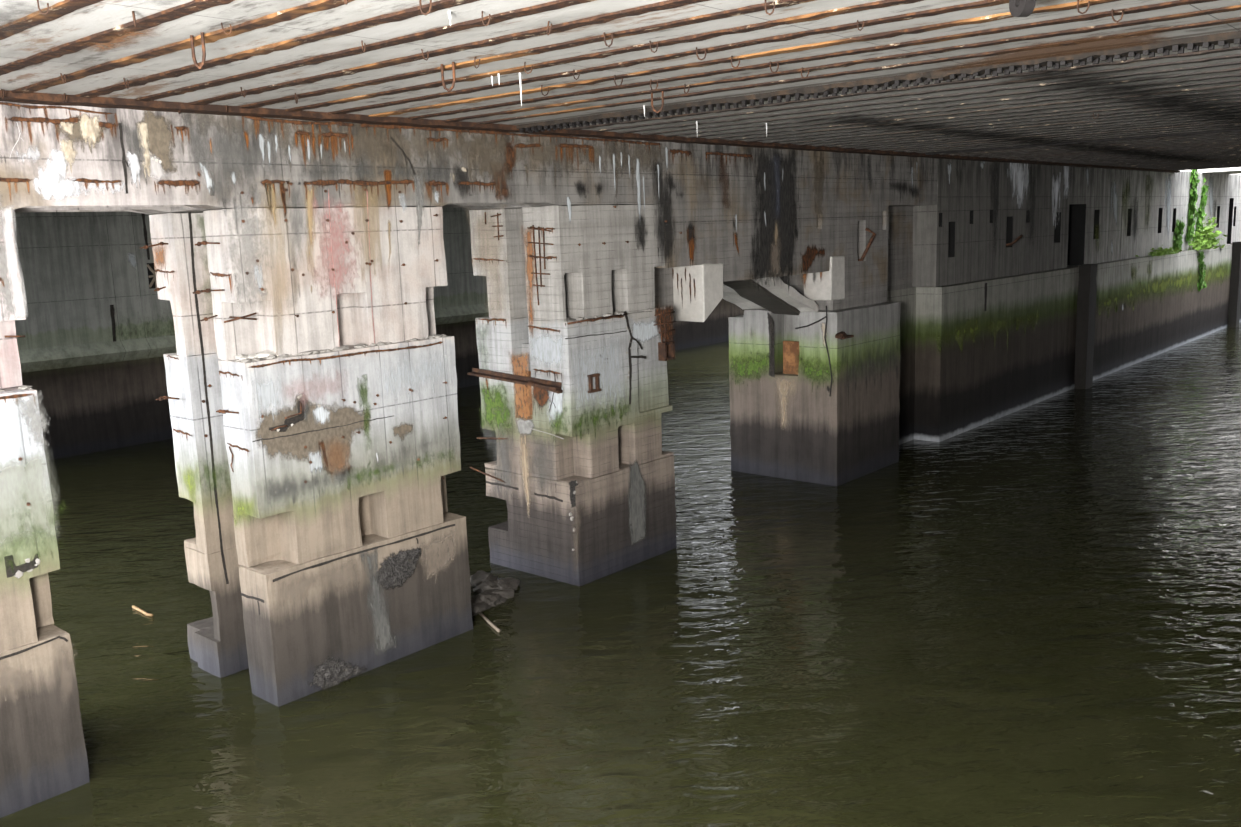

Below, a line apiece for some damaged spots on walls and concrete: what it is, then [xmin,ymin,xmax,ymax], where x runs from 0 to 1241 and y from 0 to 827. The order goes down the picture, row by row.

rust [0,102,118,143]
damp [17,114,150,200]
rust [0,177,31,200]
rust [261,179,286,215]
rust [303,170,497,208]
damp [750,148,799,290]
rust [524,227,624,333]
rust [511,354,562,420]
peeling [256,394,370,473]
spalling [4,554,40,579]
spalling [377,533,455,590]